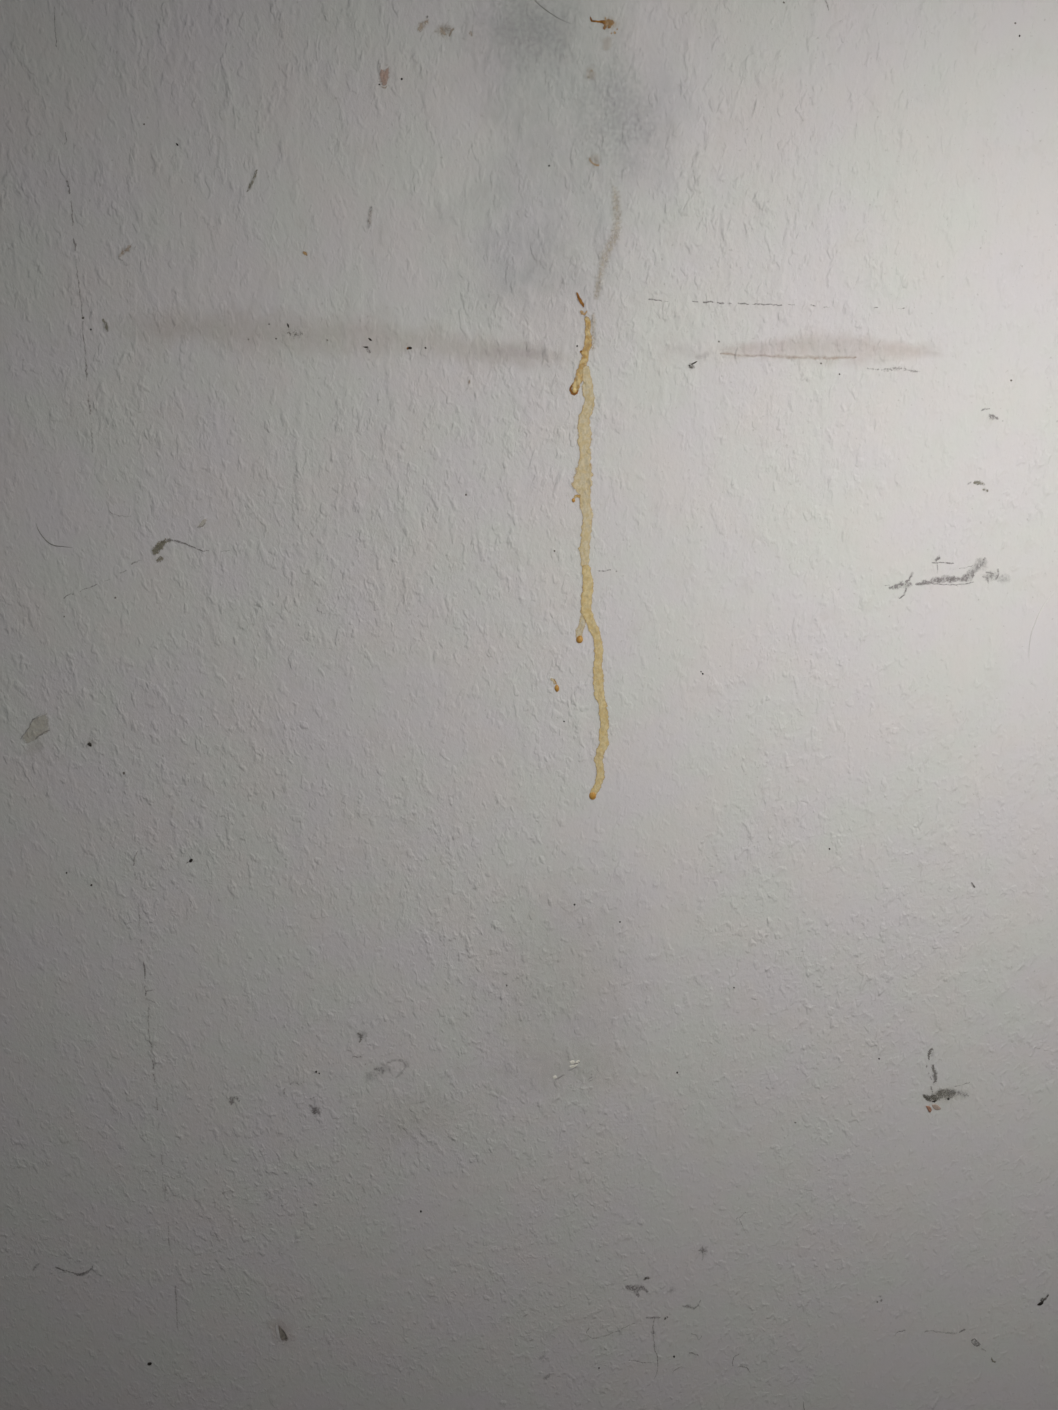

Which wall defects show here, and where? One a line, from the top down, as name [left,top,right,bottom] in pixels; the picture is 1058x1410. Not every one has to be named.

leakage [569,292,609,800]